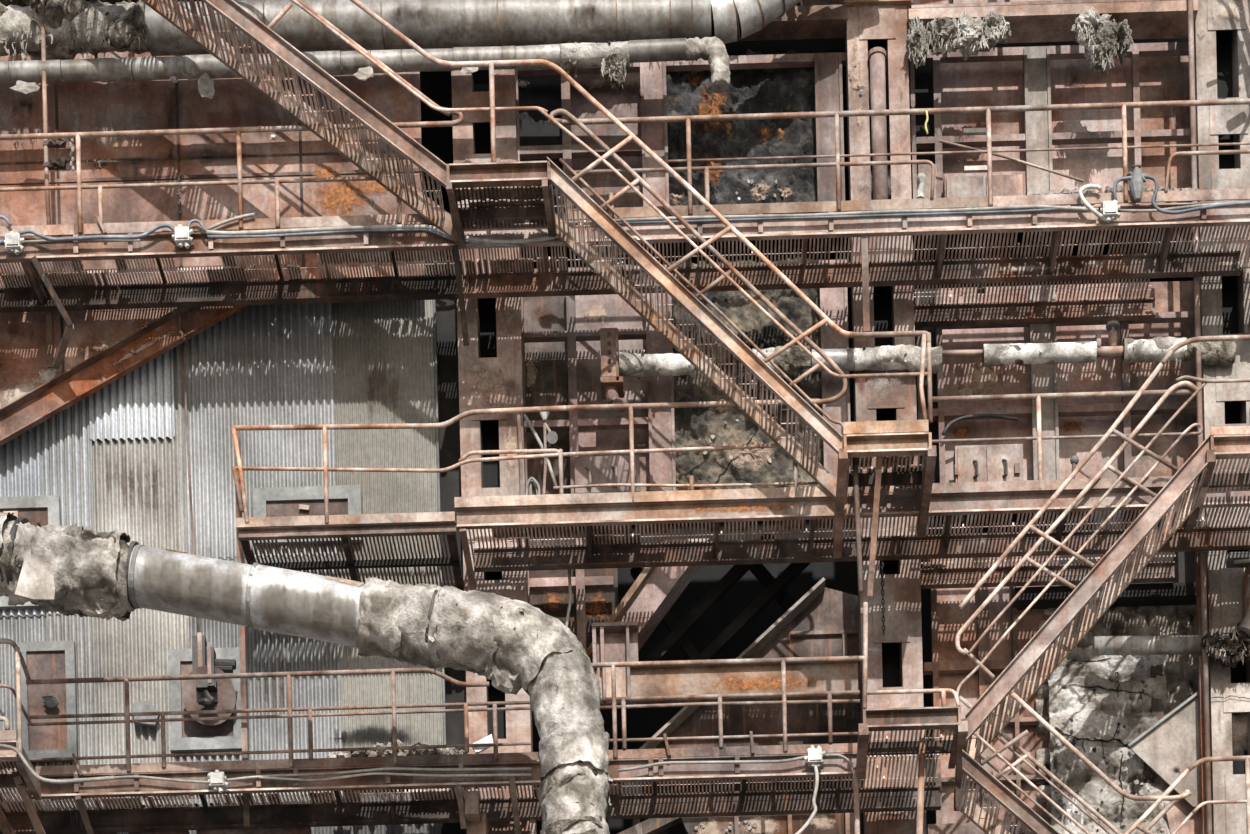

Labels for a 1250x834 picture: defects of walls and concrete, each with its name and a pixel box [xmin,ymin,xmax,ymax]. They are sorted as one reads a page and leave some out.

corrosion [690,74,731,137]
corrosion [315,166,387,215]
crack [1055,658,1152,825]